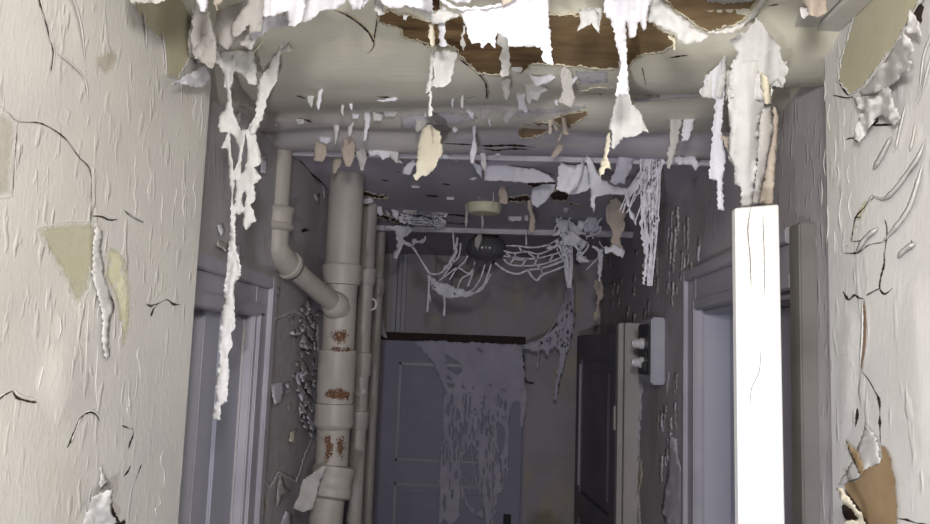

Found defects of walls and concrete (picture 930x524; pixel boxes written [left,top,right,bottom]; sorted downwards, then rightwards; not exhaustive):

crack [39,0,55,70]
peeling [800,0,828,19]
peeling [833,0,924,143]
crack [13,118,145,222]
peeling [130,0,789,420]
corrosion [331,330,352,352]
crack [843,196,892,438]
crack [0,389,38,403]
peeling [263,298,323,524]
corrosion [324,388,350,400]
corrosion [322,435,346,462]
spalling [83,467,126,524]